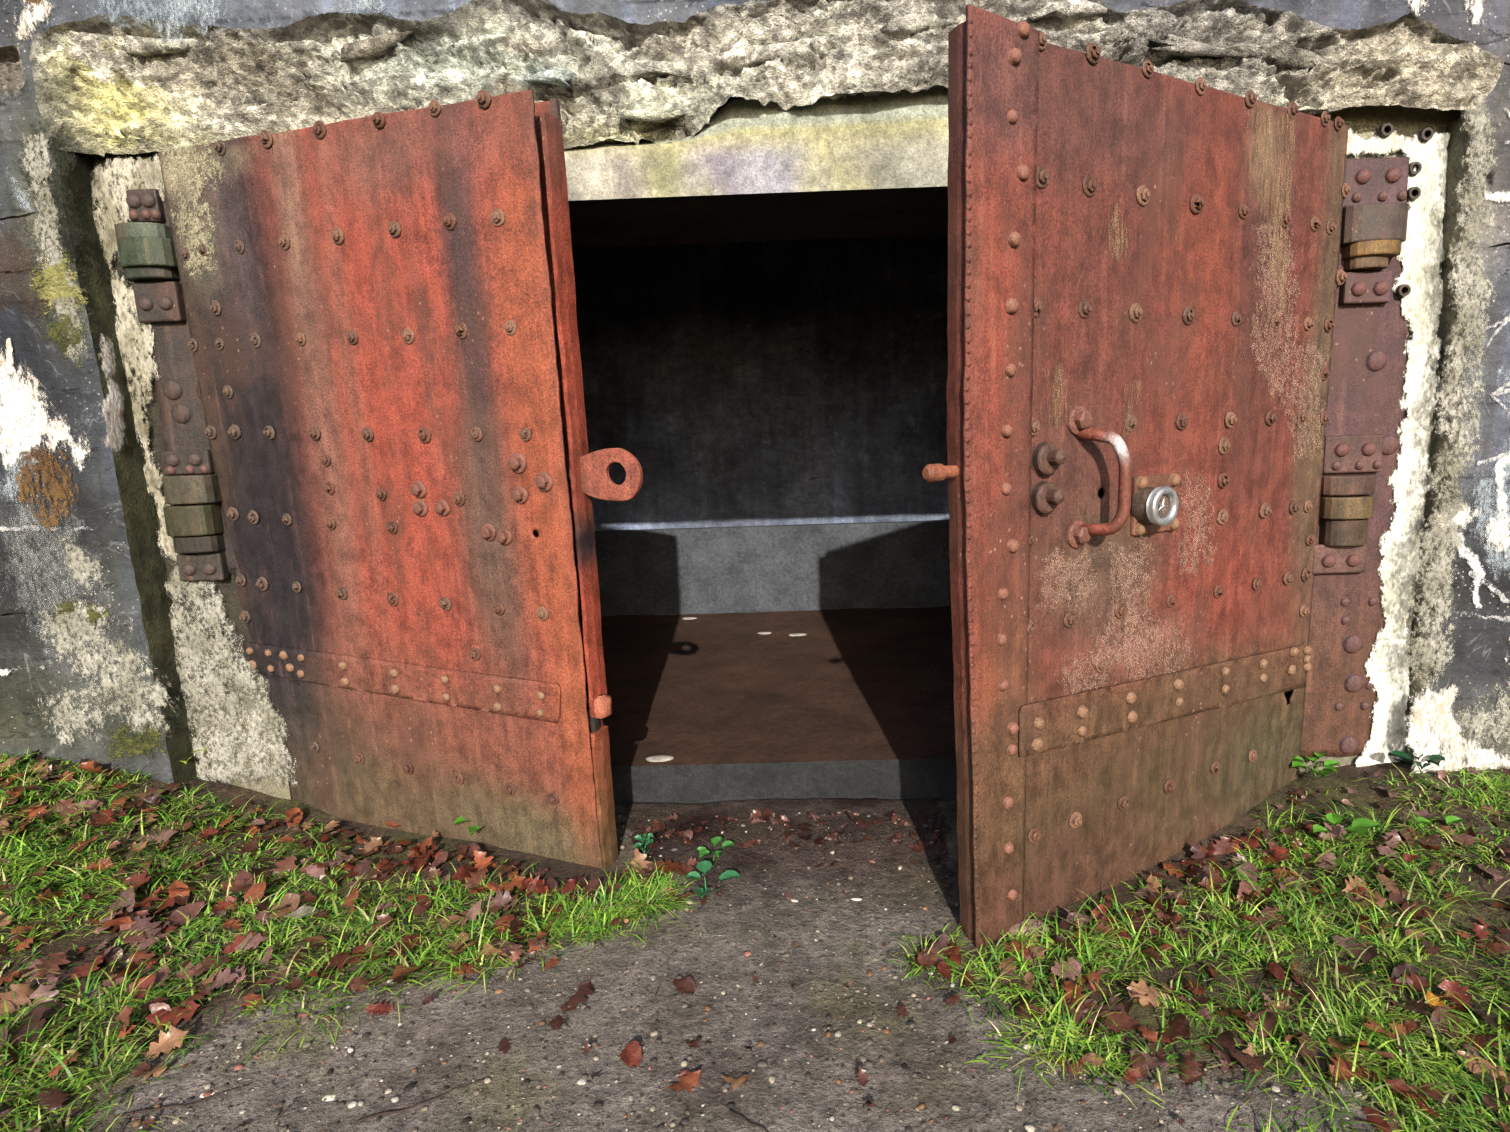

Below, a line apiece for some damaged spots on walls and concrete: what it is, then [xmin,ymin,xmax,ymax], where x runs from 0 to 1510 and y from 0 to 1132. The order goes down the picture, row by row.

damp [0,338,52,496]
spalling [0,0,1505,785]